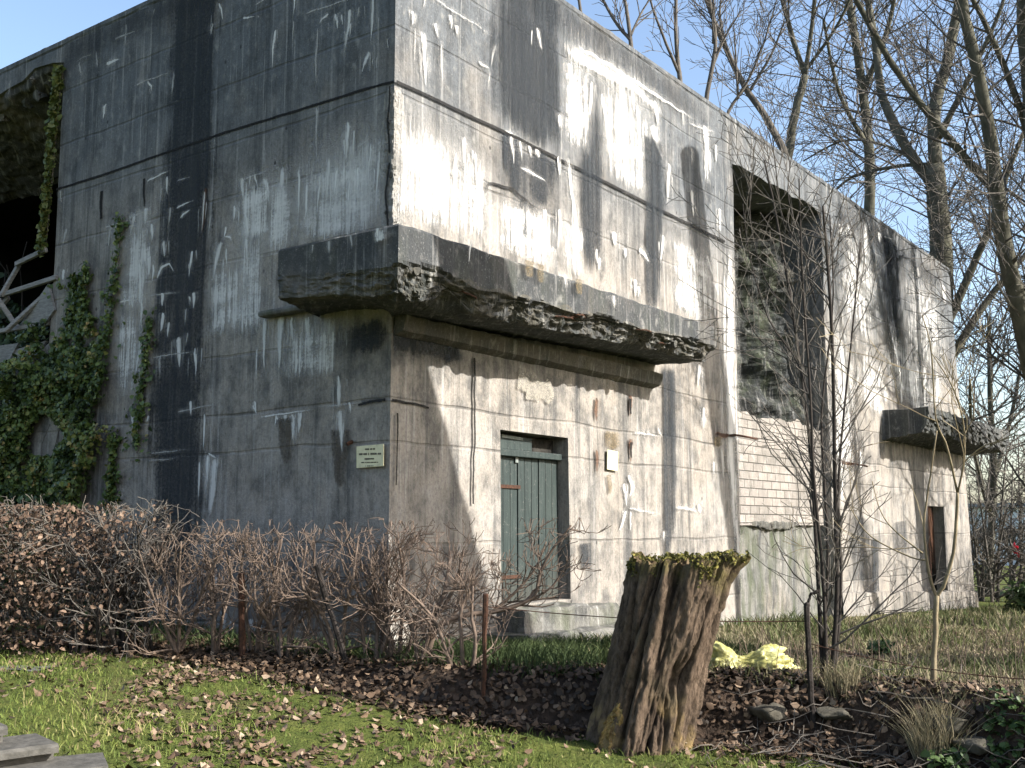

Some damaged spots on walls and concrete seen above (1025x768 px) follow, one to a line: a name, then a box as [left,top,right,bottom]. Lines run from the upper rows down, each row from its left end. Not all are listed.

crack [56,80,725,243]
water stain [398,126,484,259]
water stain [106,0,459,619]
spalling [303,264,714,362]
water stain [438,0,741,556]